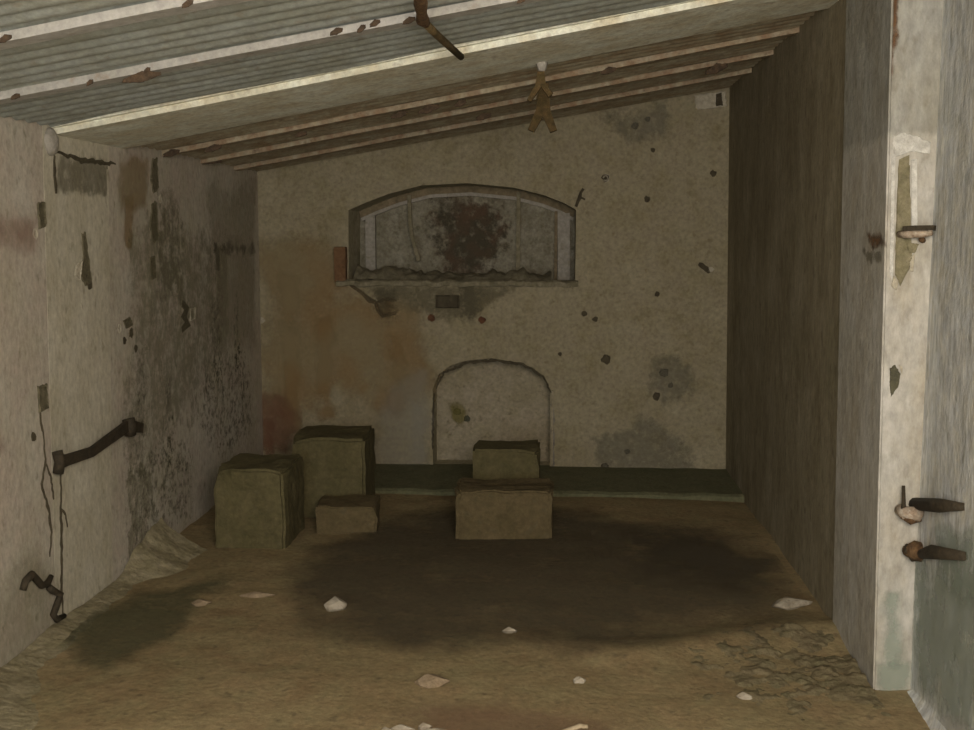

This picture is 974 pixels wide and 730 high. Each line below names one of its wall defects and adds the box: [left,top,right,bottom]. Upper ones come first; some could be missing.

rust [357,19,380,33]
rust [122,67,161,83]
damp [121,159,146,248]
peeling [890,132,931,290]
peeling [74,231,92,290]
crack [39,412,68,614]